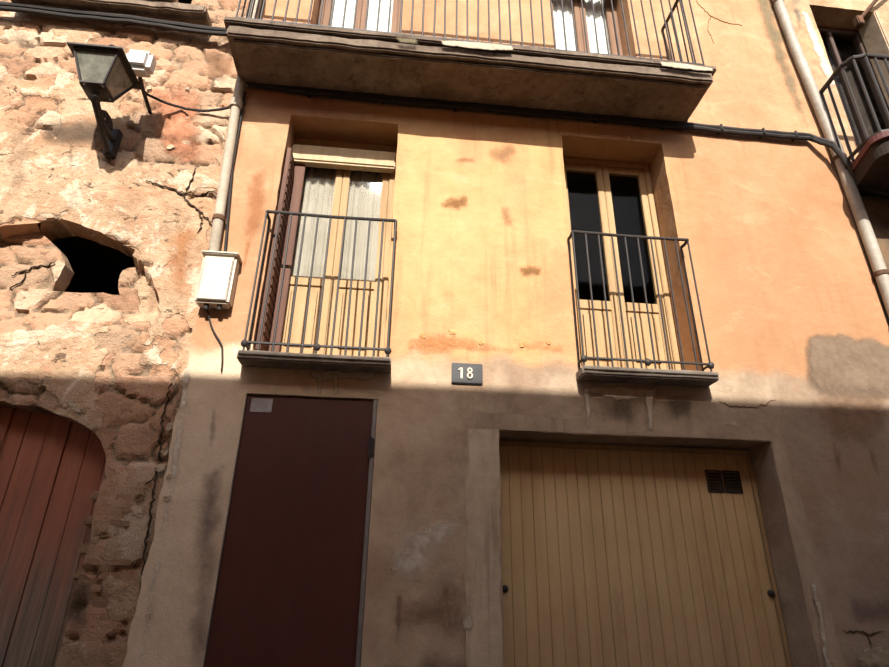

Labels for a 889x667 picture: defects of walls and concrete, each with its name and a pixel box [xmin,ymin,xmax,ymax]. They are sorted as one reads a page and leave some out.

crack [696,0,742,43]
leakage [759,0,796,91]
crack [146,168,217,233]
crack [843,630,881,649]